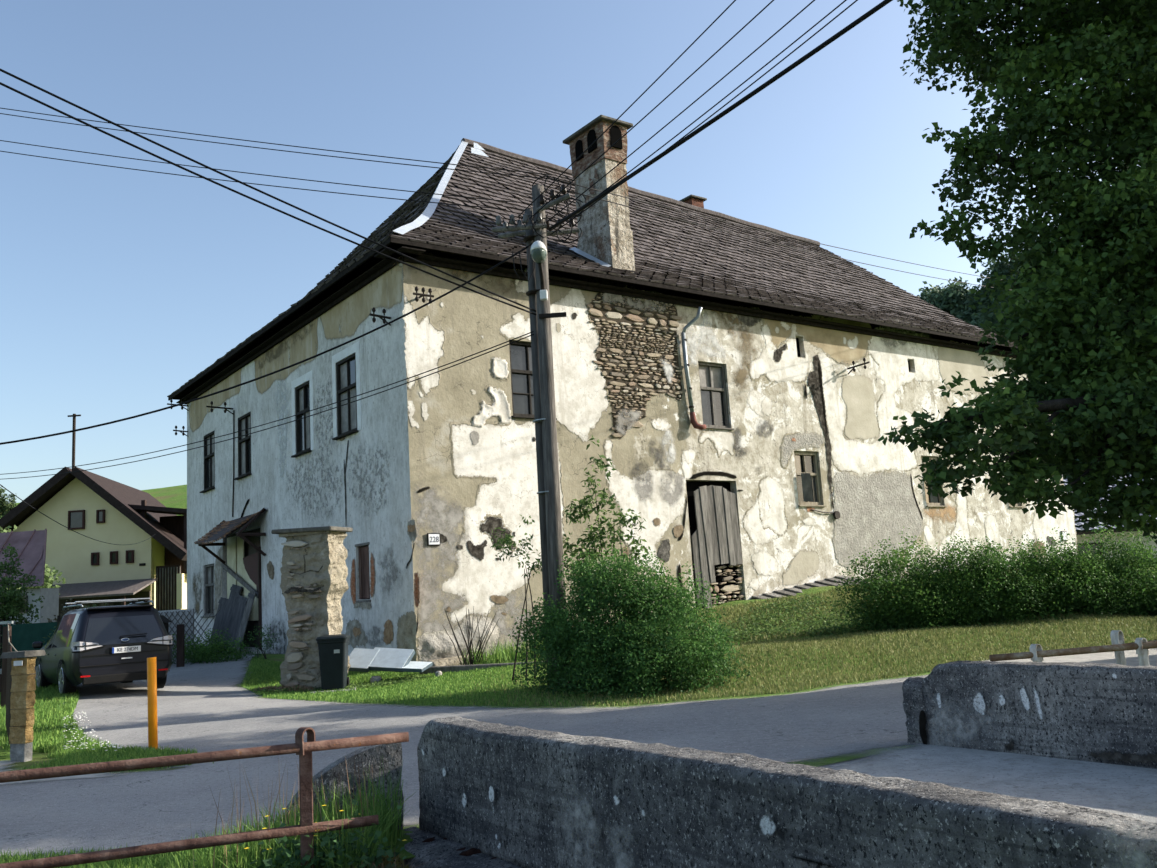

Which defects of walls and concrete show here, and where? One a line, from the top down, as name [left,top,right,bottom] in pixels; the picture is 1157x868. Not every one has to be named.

peeling [254,265,447,429]
peeling [499,312,531,340]
peeling [515,269,528,293]
peeling [189,369,241,432]
spalling [407,518,417,544]
peeling [440,356,542,624]
flaking render [550,287,736,576]
peeling [737,306,989,591]
flaking render [346,553,375,649]
spalling [383,572,420,661]